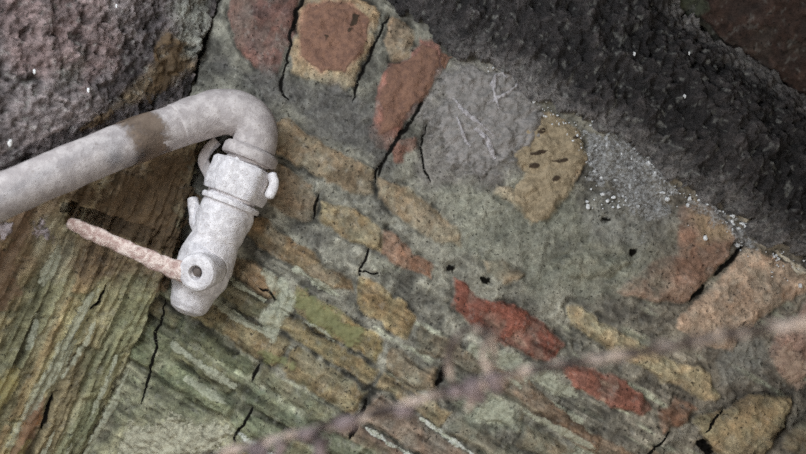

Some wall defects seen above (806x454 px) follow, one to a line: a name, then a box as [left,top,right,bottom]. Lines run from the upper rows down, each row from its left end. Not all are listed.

crack [279,0,304,100]
crack [352,15,390,102]
crack [374,99,431,183]
crack [141,300,166,404]
crack [233,407,253,445]
efflorescence [365,427,411,454]
efflorescence [419,417,474,454]